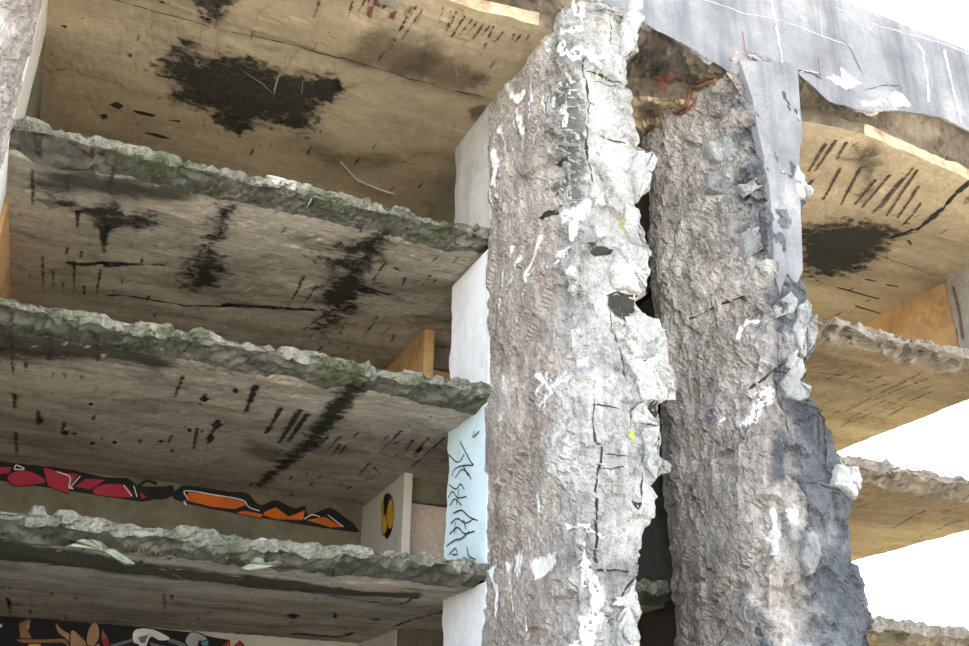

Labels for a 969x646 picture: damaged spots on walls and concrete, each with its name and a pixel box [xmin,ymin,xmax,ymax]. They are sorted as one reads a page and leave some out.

damp [145,0,480,159]
crack [705,0,969,94]
flaking render [265,175,297,193]
damp [221,230,392,335]
spalling [588,242,613,256]
spalling [608,294,635,321]
crack [606,291,647,381]
damp [802,217,918,281]
crack [881,180,969,277]
damp [256,379,368,487]
crack [592,400,655,606]
flaking render [65,539,135,565]